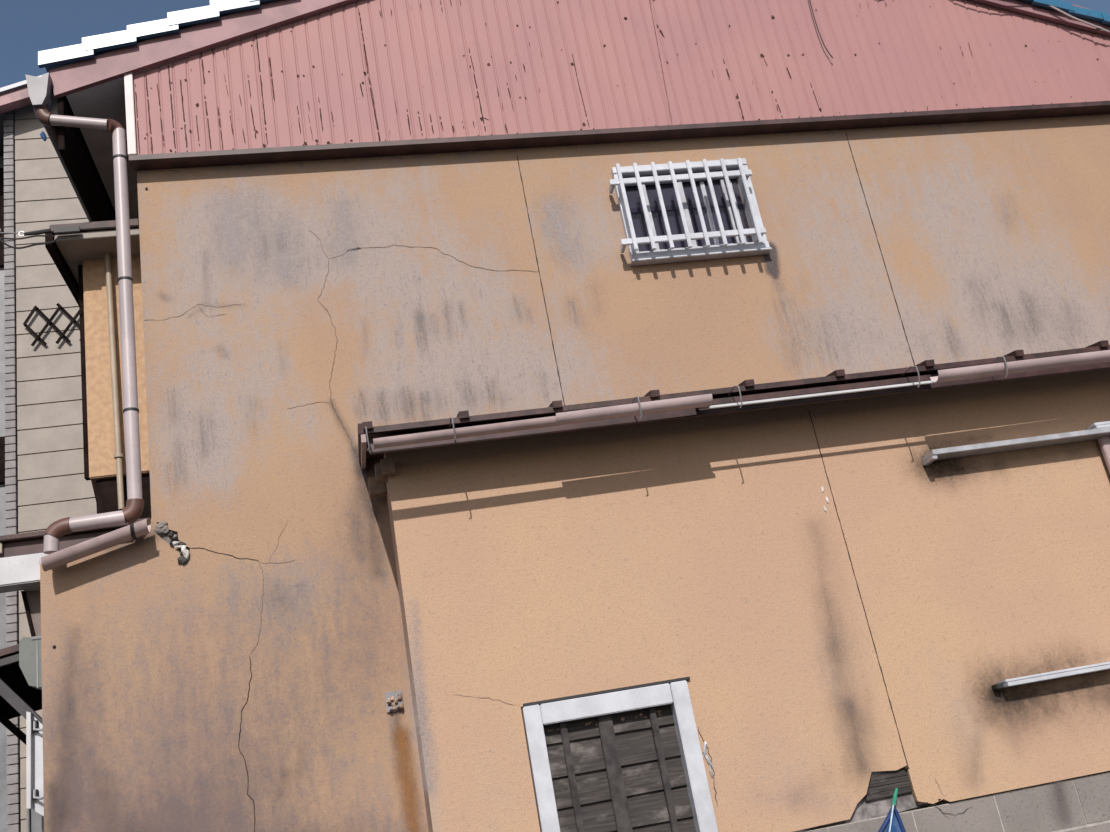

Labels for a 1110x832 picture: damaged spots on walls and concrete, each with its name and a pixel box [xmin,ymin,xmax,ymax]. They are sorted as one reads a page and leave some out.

crack [288,232,539,452]
leakage [765,243,778,278]
crack [194,521,296,832]
spalling [843,767,941,824]